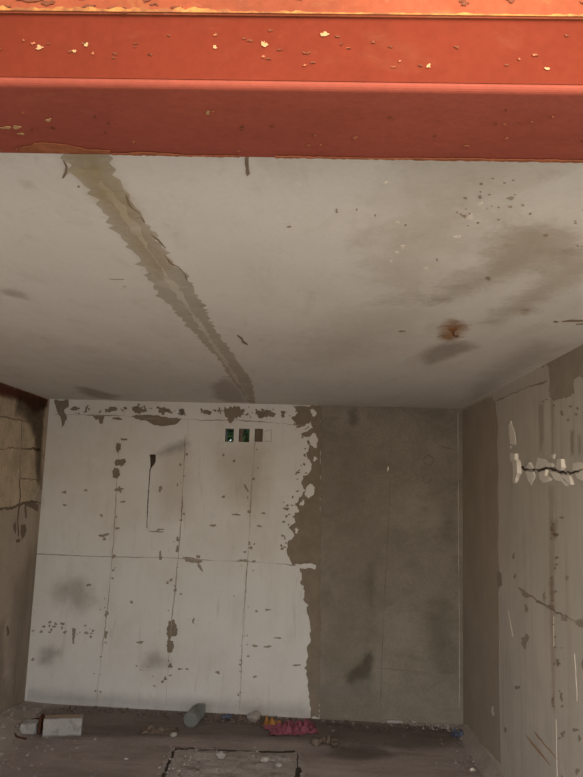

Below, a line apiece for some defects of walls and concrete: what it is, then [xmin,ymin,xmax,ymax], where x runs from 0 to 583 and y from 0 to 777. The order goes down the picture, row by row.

peeling [542,346,583,422]
crack [0,416,40,537]
spalling [0,382,186,543]
peeling [60,154,322,718]
crack [509,421,583,486]
crack [518,587,582,624]
crack [161,747,302,777]